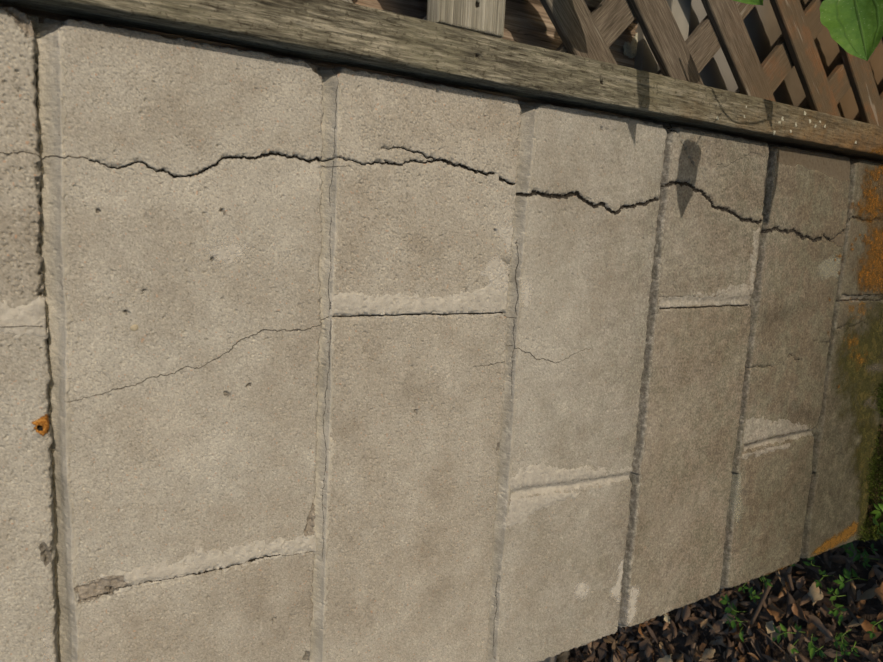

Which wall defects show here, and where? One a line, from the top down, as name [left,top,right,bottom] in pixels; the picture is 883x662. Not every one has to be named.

crack [0,68,882,247]
crack [653,304,748,314]
corrosion [32,414,49,436]
crack [70,241,591,600]
water stain [812,522,858,555]